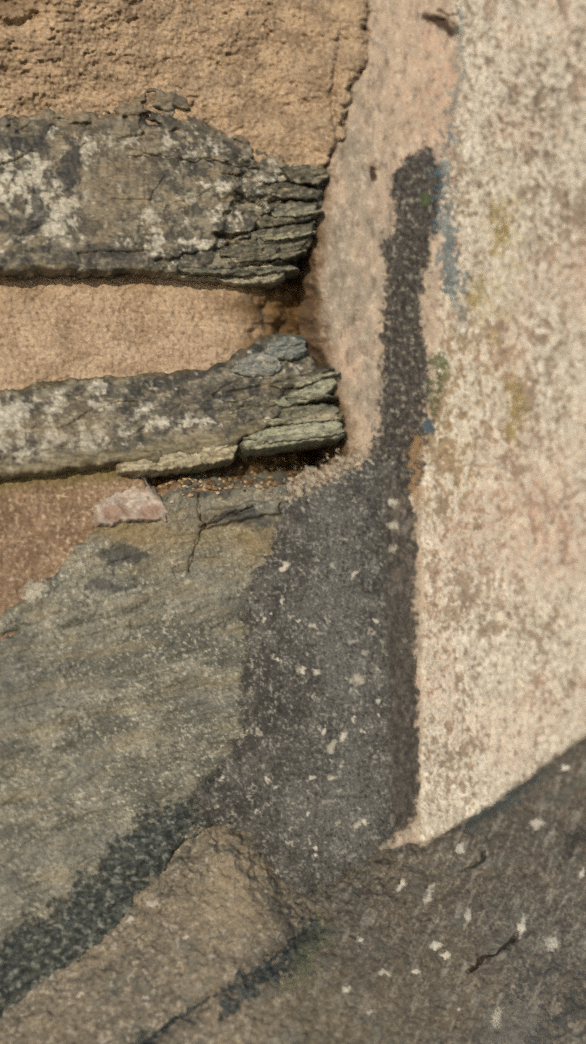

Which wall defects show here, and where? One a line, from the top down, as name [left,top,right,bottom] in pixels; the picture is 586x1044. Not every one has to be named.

water stain [279,130,470,503]
crack [188,492,253,572]